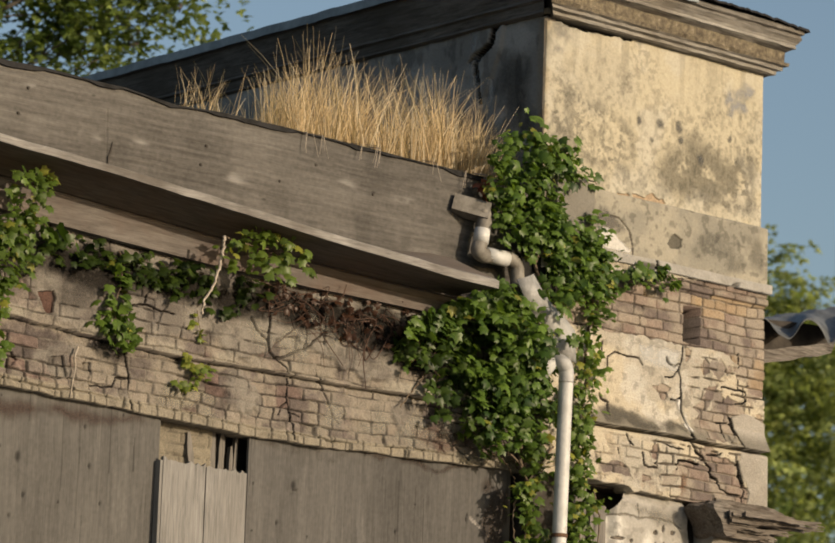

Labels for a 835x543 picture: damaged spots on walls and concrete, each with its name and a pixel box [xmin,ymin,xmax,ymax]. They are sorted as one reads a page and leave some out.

crack [471,29,498,104]
spalling [667,234,682,249]
spalling [38,291,54,313]
crack [601,346,643,367]
flaking render [551,275,768,400]
crack [617,346,746,502]
spalling [692,386,747,443]
spalling [598,460,632,477]
flaking render [677,453,747,503]